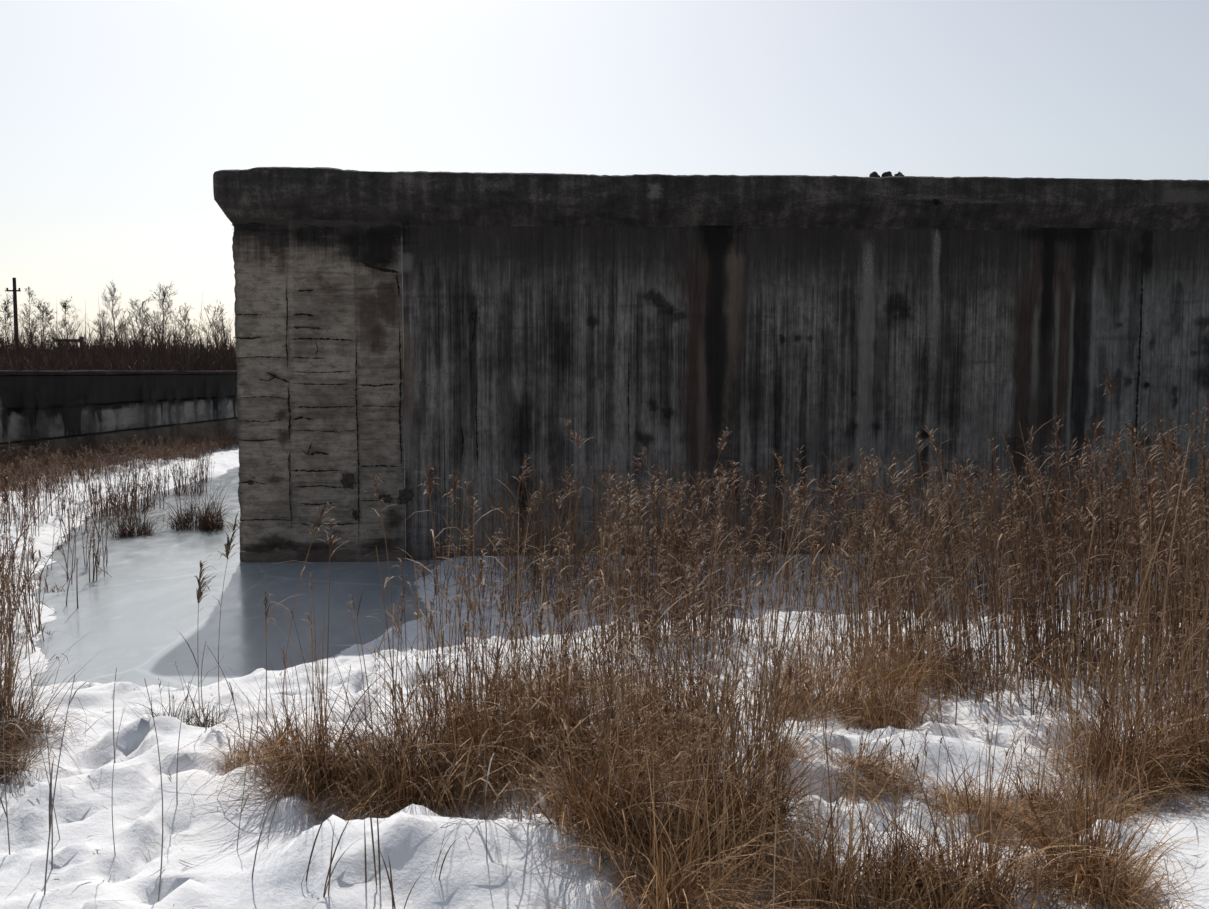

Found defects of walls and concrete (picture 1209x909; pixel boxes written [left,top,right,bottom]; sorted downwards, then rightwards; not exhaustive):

crack [232,260,403,541]
water stain [297,225,409,266]
water stain [468,294,477,450]
water stain [516,399,532,514]
rust [682,225,742,503]
water stain [774,335,813,506]
rust [1028,252,1077,481]
water stain [1028,228,1093,457]